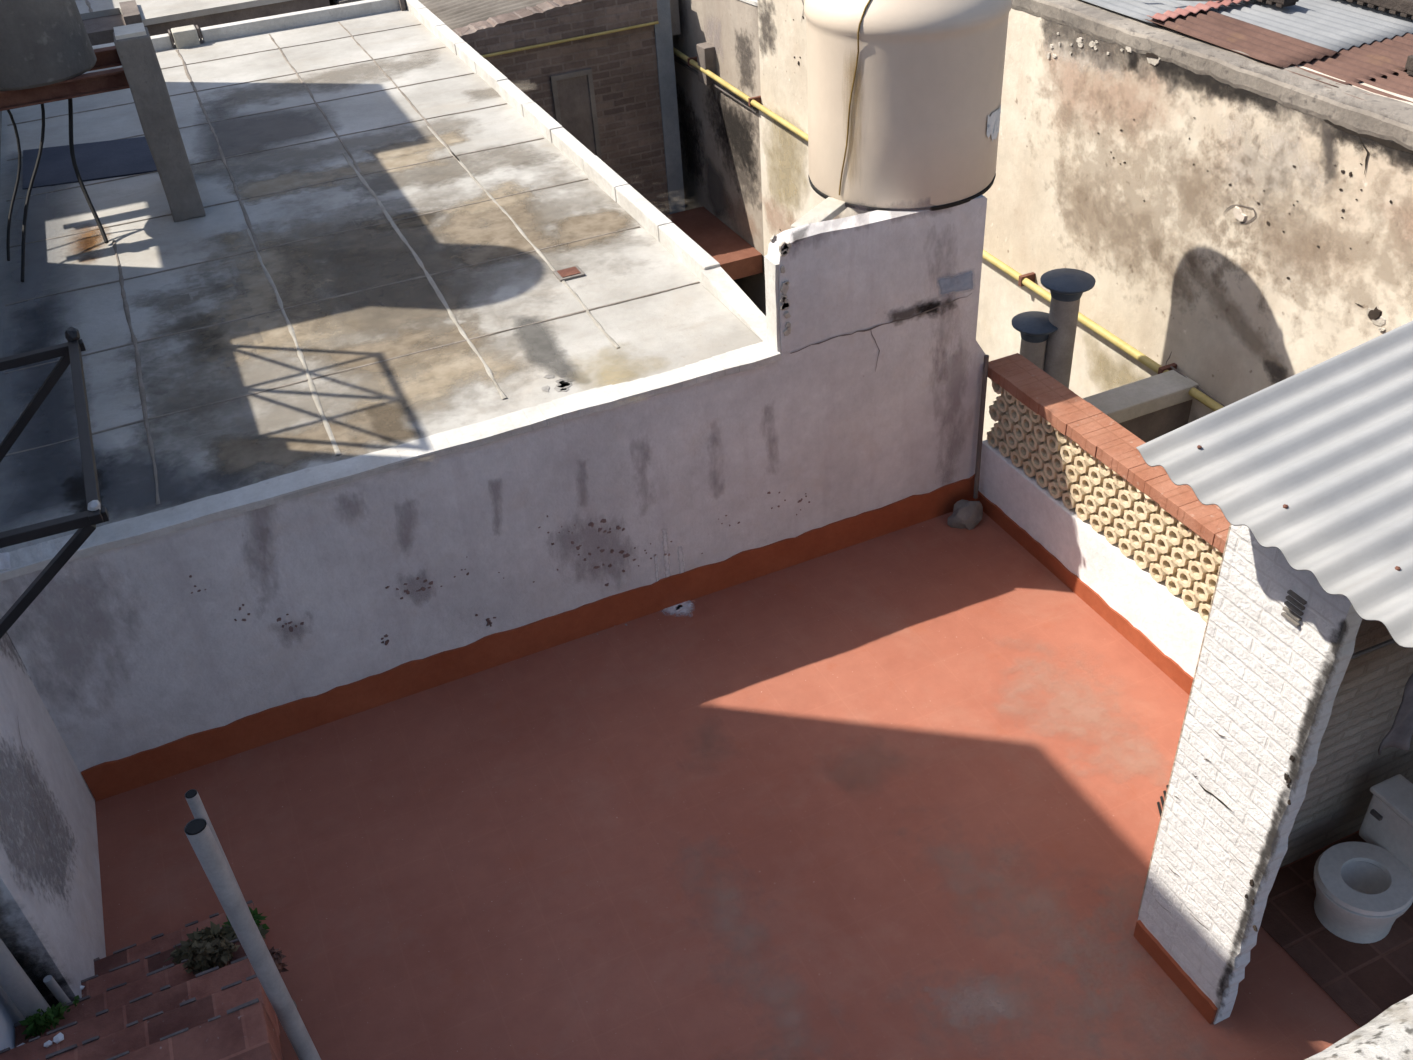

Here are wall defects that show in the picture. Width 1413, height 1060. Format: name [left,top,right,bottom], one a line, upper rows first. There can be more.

water stain [736,1,773,90]
water stain [1042,20,1413,178]
water stain [0,64,635,527]
spalling [770,229,792,336]
crack [790,293,972,372]
water stain [1097,355,1134,387]
water stain [1211,289,1286,383]
water stain [0,740,74,899]
water stain [0,907,67,1009]